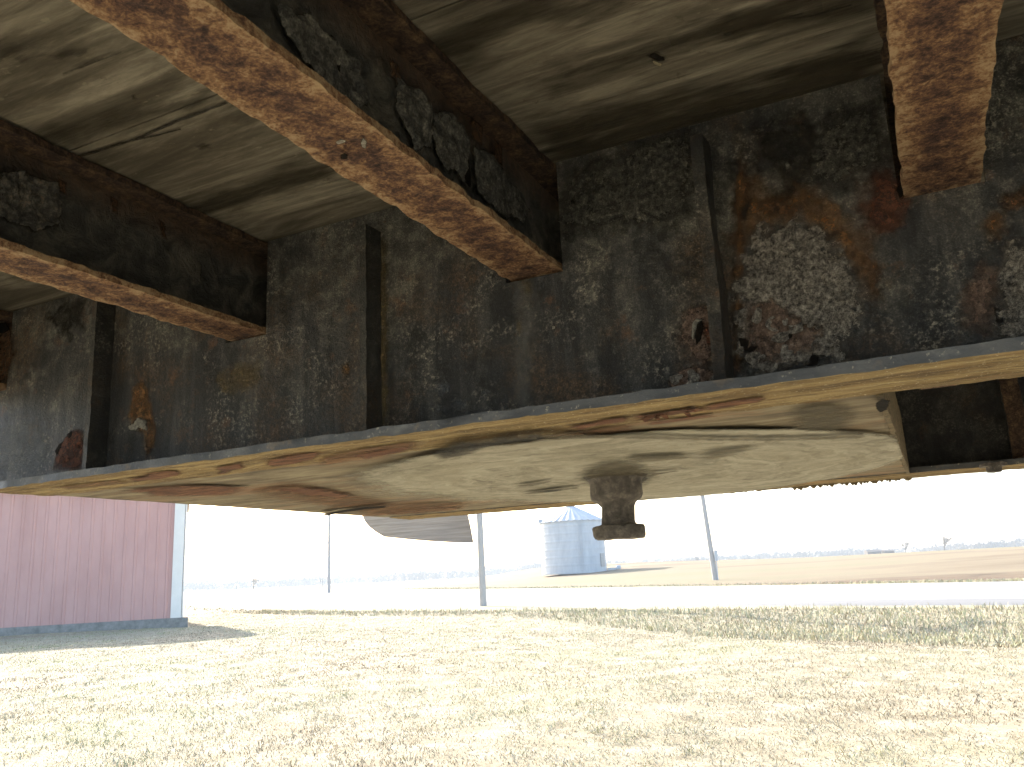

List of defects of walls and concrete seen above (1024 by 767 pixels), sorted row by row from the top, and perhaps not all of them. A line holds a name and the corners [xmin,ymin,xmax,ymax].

peeling [395,77,530,224]
peeling [729,211,871,376]
corrosion [128,384,155,453]